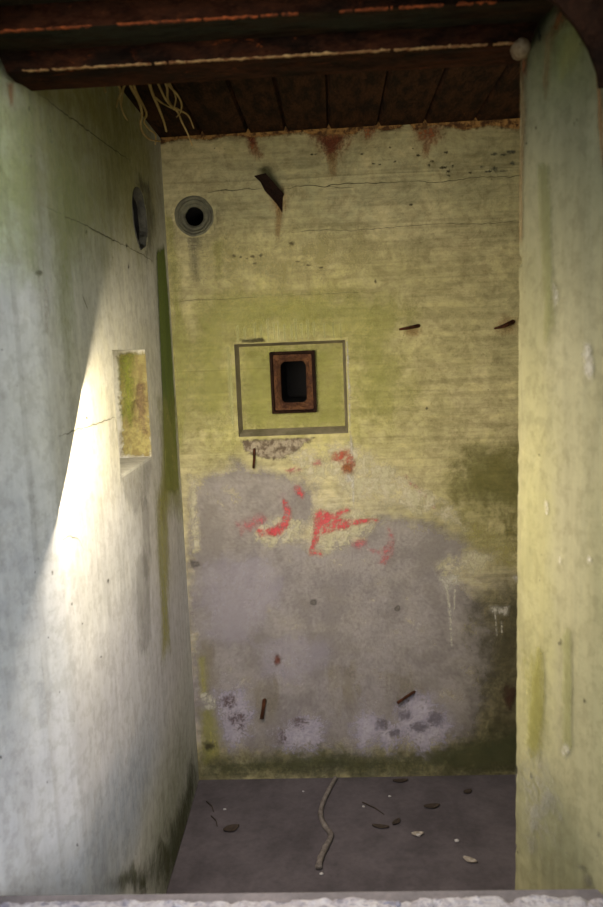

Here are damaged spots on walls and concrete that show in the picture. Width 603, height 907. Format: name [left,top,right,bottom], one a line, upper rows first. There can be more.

corrosion [319,133,350,158]
crack [289,175,520,189]
water stain [157,247,179,651]
water stain [188,463,517,754]
peeling [200,689,255,748]
water stain [527,650,544,754]